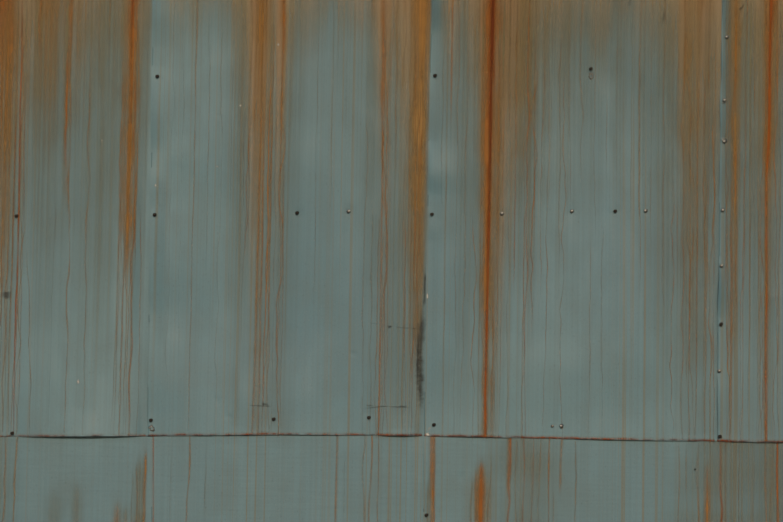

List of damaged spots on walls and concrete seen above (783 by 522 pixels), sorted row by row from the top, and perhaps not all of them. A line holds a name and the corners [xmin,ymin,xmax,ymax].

rust [120,0,139,249]
rust [411,0,428,227]
rust [449,0,634,488]
rust [760,0,780,386]
rust [376,334,439,441]